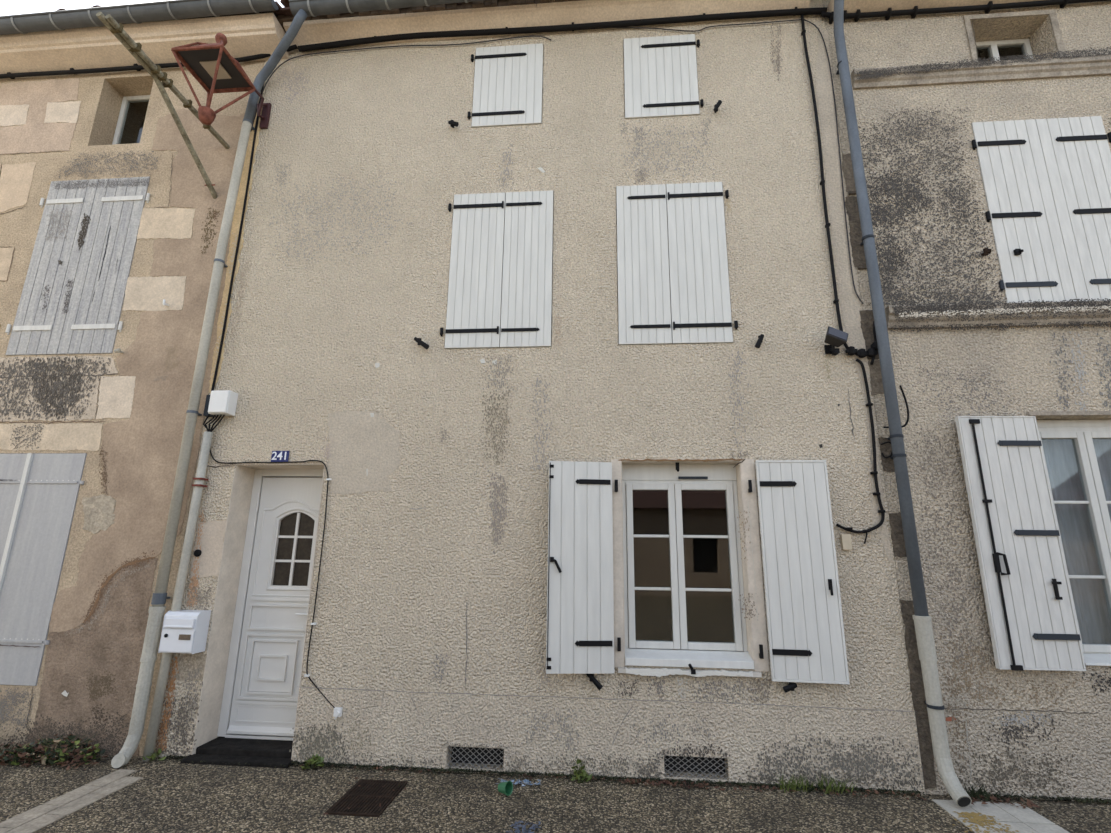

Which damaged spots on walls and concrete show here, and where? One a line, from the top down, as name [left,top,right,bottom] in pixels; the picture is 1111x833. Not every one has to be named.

leakage [0,355,112,451]
leakage [848,99,1111,411]